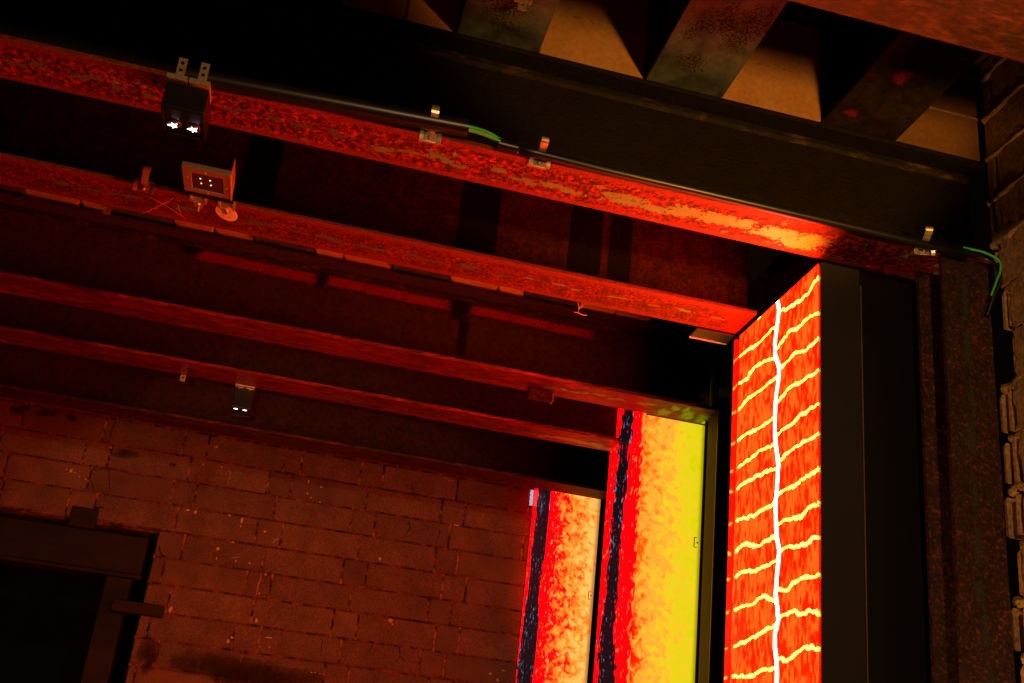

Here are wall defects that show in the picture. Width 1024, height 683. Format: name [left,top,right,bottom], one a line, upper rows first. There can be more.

peeling [367,144,468,169]
peeling [490,166,833,251]